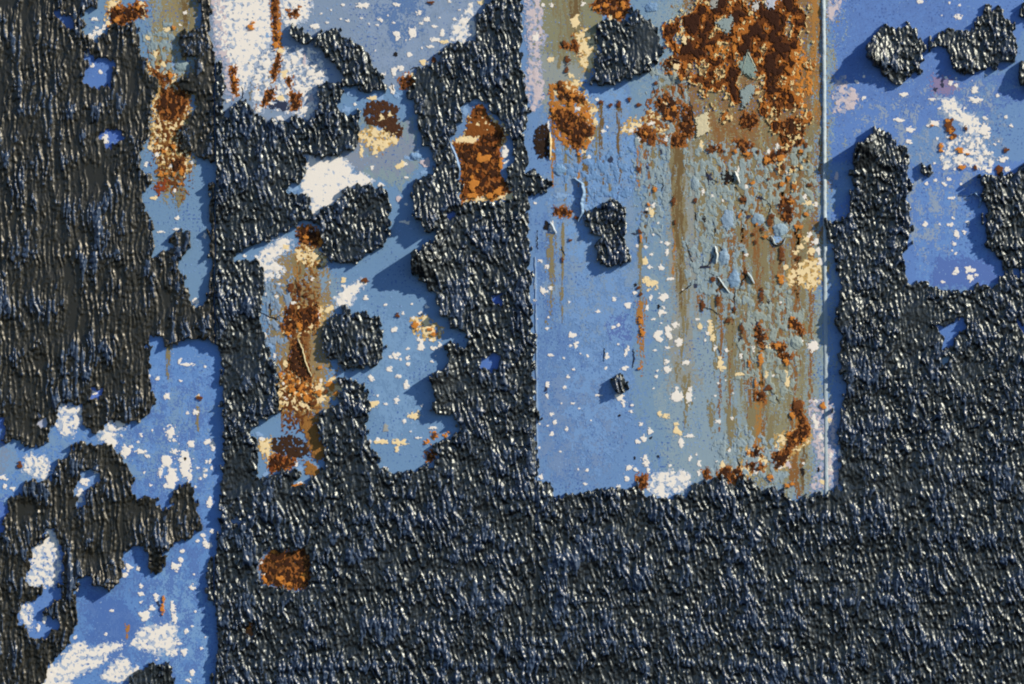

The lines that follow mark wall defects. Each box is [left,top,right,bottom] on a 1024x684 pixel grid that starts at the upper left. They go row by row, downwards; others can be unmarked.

rust [106,0,149,28]
rust [147,42,195,211]
rust [363,99,404,158]
rust [453,103,513,207]
peeling [893,30,1024,173]
peeling [54,0,492,487]
rust [267,224,341,487]
peeling [446,0,861,503]
rust [533,0,827,499]
peeling [929,266,976,293]
peeling [0,334,243,684]
rust [259,548,311,591]